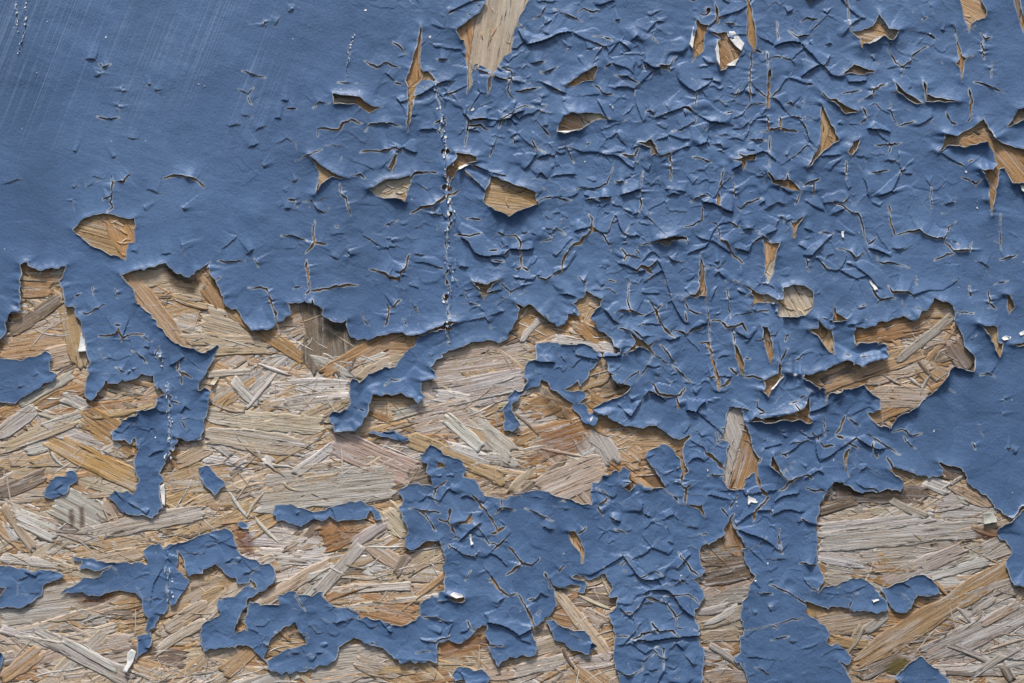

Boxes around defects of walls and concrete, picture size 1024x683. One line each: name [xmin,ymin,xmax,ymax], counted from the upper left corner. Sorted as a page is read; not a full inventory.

peeling [451,0,536,102]
crack [745,18,802,137]
crack [843,0,855,28]
crack [855,43,933,128]
crack [99,169,209,214]
crack [244,283,282,325]
crack [302,64,537,347]
peeling [439,147,546,224]
crack [504,194,794,414]
peeling [711,0,1024,505]
crack [801,174,1006,314]
peeling [0,207,1024,683]